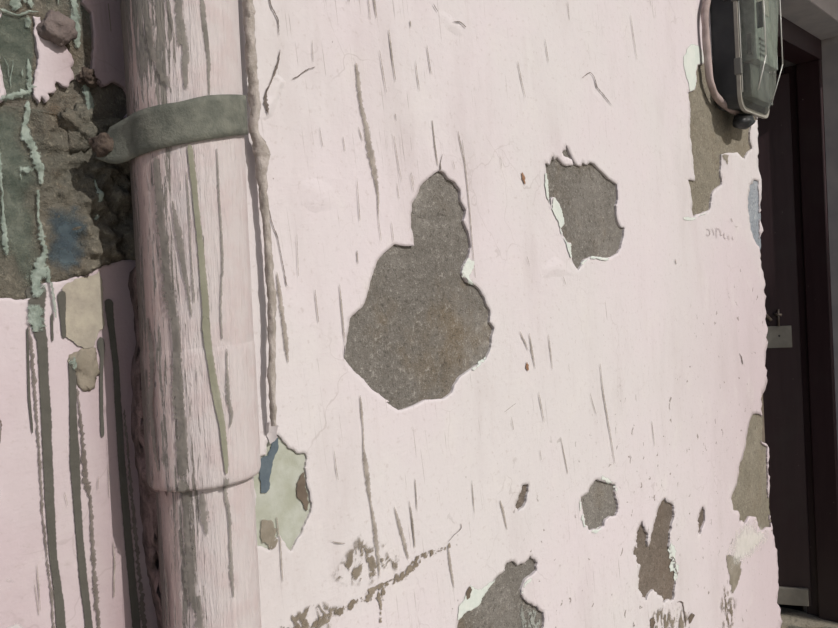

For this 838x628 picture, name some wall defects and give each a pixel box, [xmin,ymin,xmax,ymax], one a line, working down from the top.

flaking render [0,0,135,300]
flaking render [545,150,623,269]
flaking render [684,44,757,221]
flaking render [748,180,761,249]
flaking render [344,171,492,410]
flaking render [254,422,311,550]
spalling [283,538,451,628]
flaking render [457,558,542,628]
flaking render [579,476,618,533]
flaking render [633,500,695,628]
flaking render [731,414,771,530]